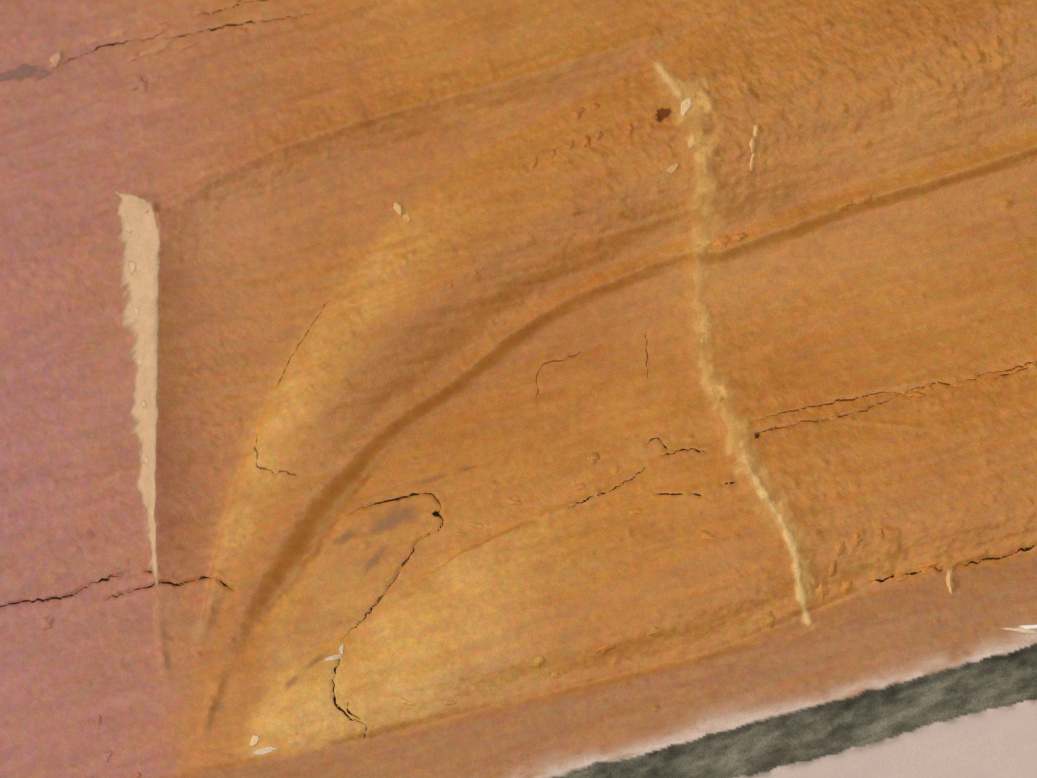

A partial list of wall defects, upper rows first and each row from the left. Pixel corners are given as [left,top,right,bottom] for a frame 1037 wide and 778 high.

crack [67,0,298,62]
crack [751,362,1033,433]
crack [568,437,703,508]
crack [659,481,737,496]
crack [0,571,231,607]
crack [332,493,444,738]
crack [870,545,1037,583]